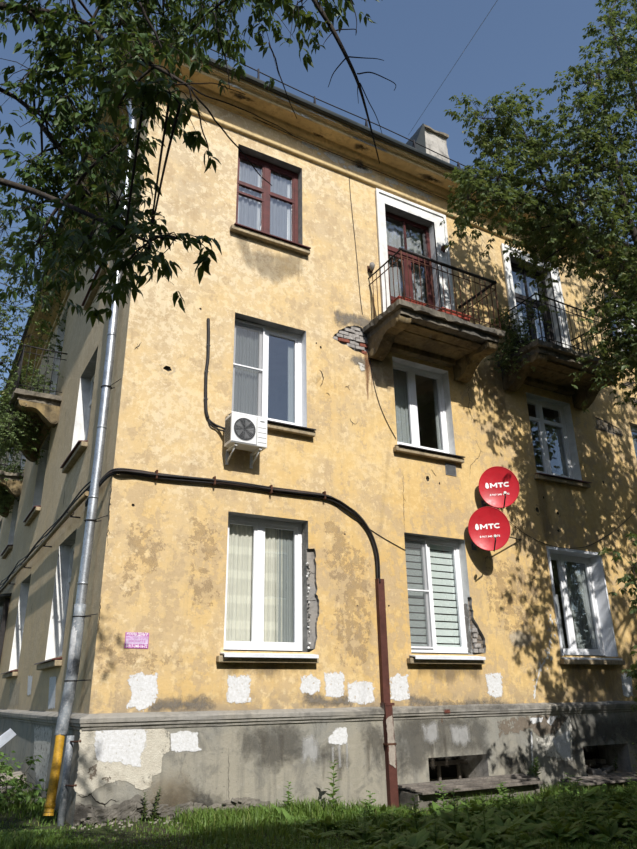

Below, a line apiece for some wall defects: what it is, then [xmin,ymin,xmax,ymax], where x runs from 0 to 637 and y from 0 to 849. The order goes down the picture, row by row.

flaking render [333,311,370,371]
flaking render [302,528,319,649]
flaking render [464,597,486,653]
peeling [497,715,573,761]
peeling [73,728,272,827]